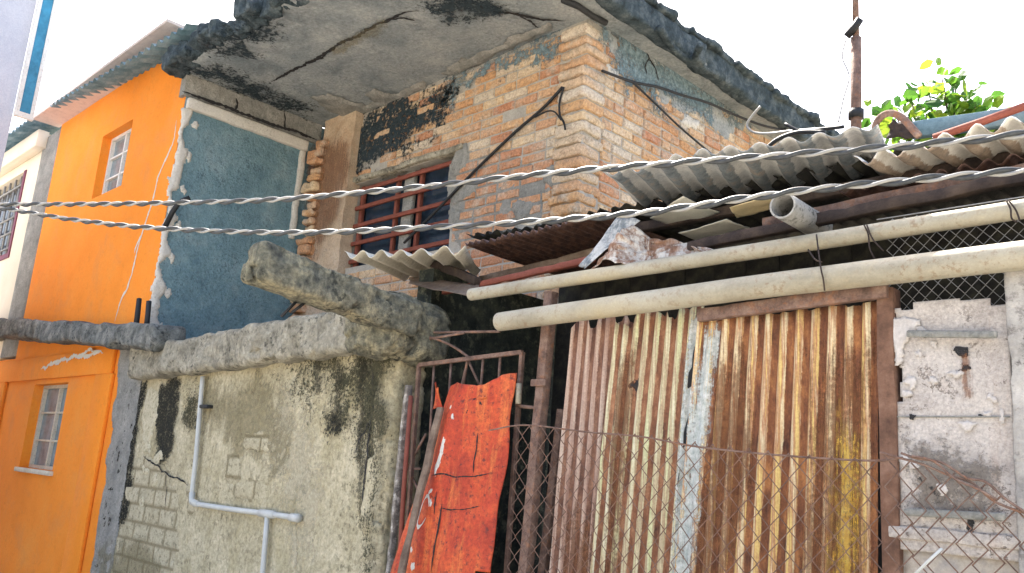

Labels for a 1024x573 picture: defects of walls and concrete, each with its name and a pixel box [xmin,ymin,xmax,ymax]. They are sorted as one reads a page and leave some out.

crack [271,11,415,82]
spalling [310,81,427,116]
crack [115,120,177,319]
peeling [150,108,199,325]
spalling [296,140,330,260]
crack [41,347,102,370]
leakage [100,376,199,537]
leakage [269,364,344,566]
leakage [354,356,376,513]
rust [690,343,756,573]
rust [800,341,876,573]
rust [962,354,970,397]